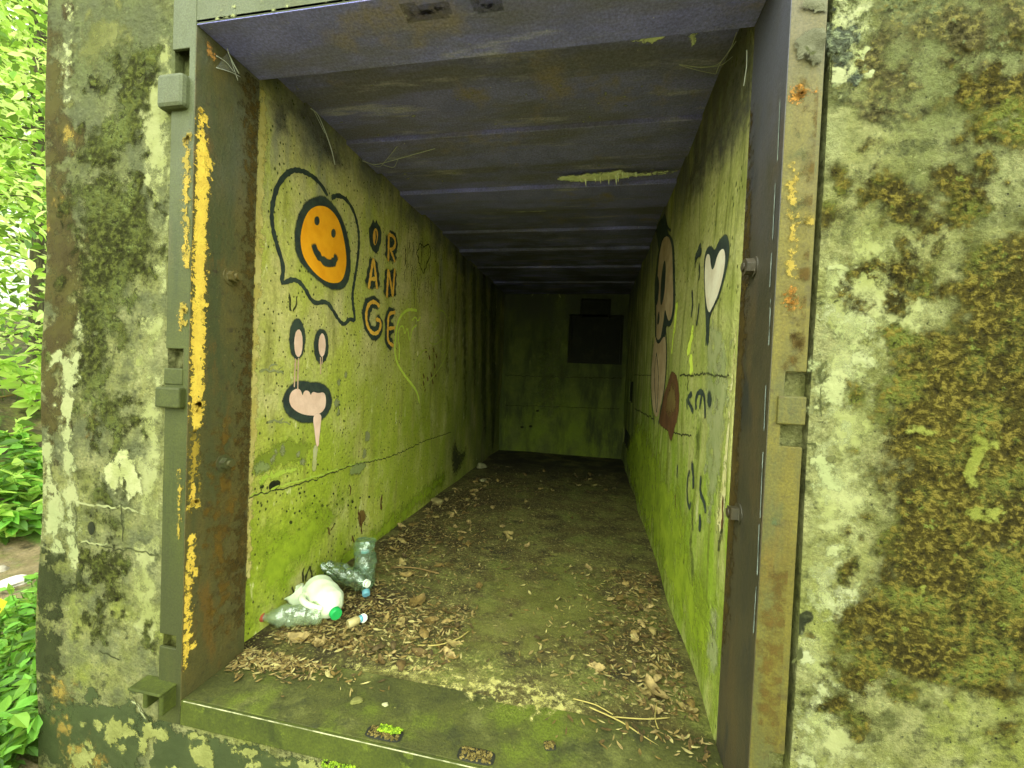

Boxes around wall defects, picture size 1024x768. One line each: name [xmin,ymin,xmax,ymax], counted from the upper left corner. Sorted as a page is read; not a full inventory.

corrosion [788,79,818,137]
damp [558,85,751,198]
corrosion [783,161,815,317]
damp [35,1,95,713]
flaking render [100,38,215,672]
corrosion [200,72,260,640]
corrosion [784,334,805,369]
damp [907,425,936,436]
damp [963,435,999,488]
crack [74,501,158,556]
damp [967,505,1007,522]